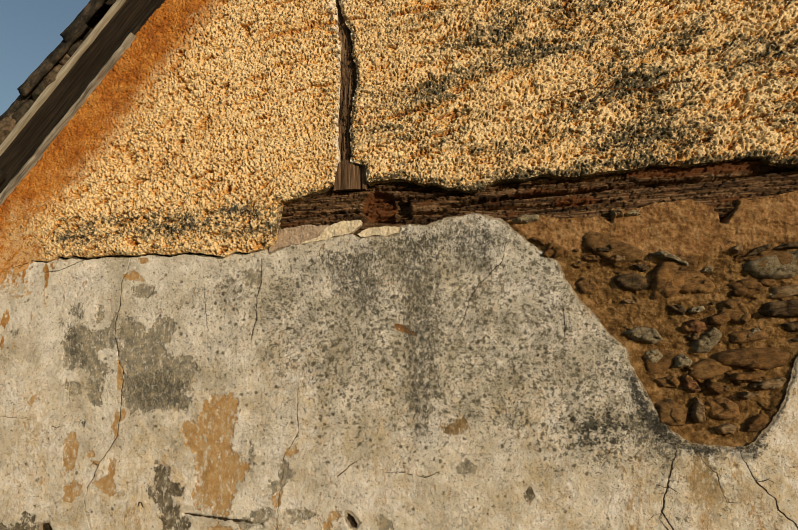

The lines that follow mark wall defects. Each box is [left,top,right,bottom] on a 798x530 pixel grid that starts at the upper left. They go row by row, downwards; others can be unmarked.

peeling [123,258,157,298]
damp [61,303,85,363]
peeling [61,305,201,439]
crack [16,242,262,517]
damp [127,365,191,409]
spalling [506,191,798,505]
peeling [62,431,116,503]
peeling [144,392,316,530]
peeling [323,511,358,530]
peeling [456,458,477,475]
crack [648,450,677,530]
crack [740,452,798,529]